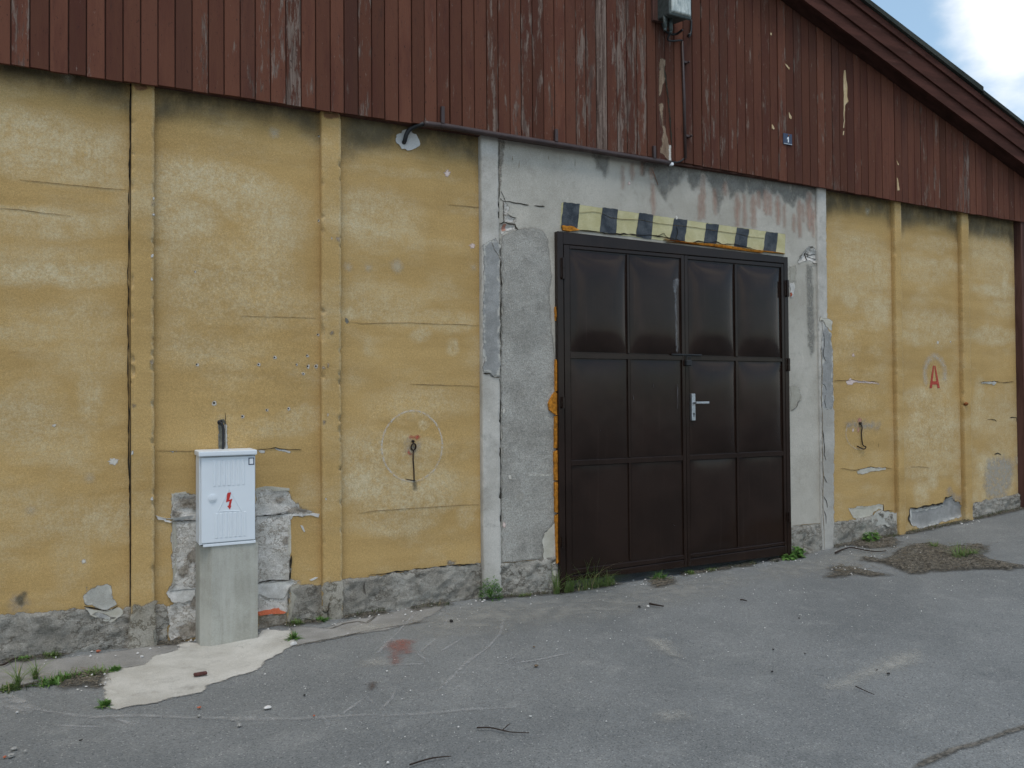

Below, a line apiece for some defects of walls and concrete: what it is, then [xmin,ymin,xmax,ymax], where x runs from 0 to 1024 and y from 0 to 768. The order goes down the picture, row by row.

leakage [642,162,886,210]
crack [361,153,545,525]
flaking render [83,584,123,623]
flaking render [156,491,197,641]
flaking render [255,486,319,629]
flaking render [848,496,962,529]